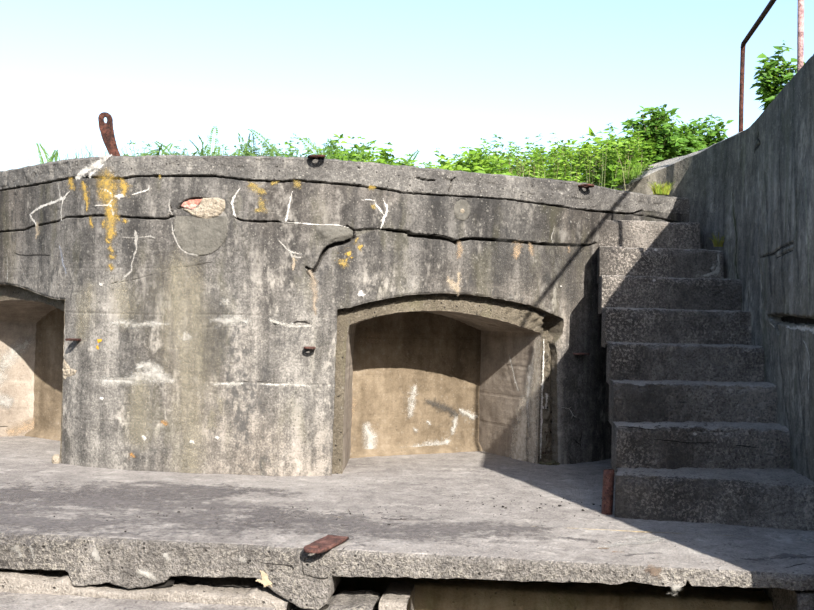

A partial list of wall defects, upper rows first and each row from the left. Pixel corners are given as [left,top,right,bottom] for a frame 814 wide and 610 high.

efflorescence [29,185,70,239]
crack [0,215,174,233]
spalling [181,198,225,219]
crack [237,217,296,225]
crack [5,175,676,223]
crack [383,230,588,247]
efflorescence [123,230,154,278]
crack [308,237,353,277]
crack [6,568,69,576]
crack [131,562,328,589]